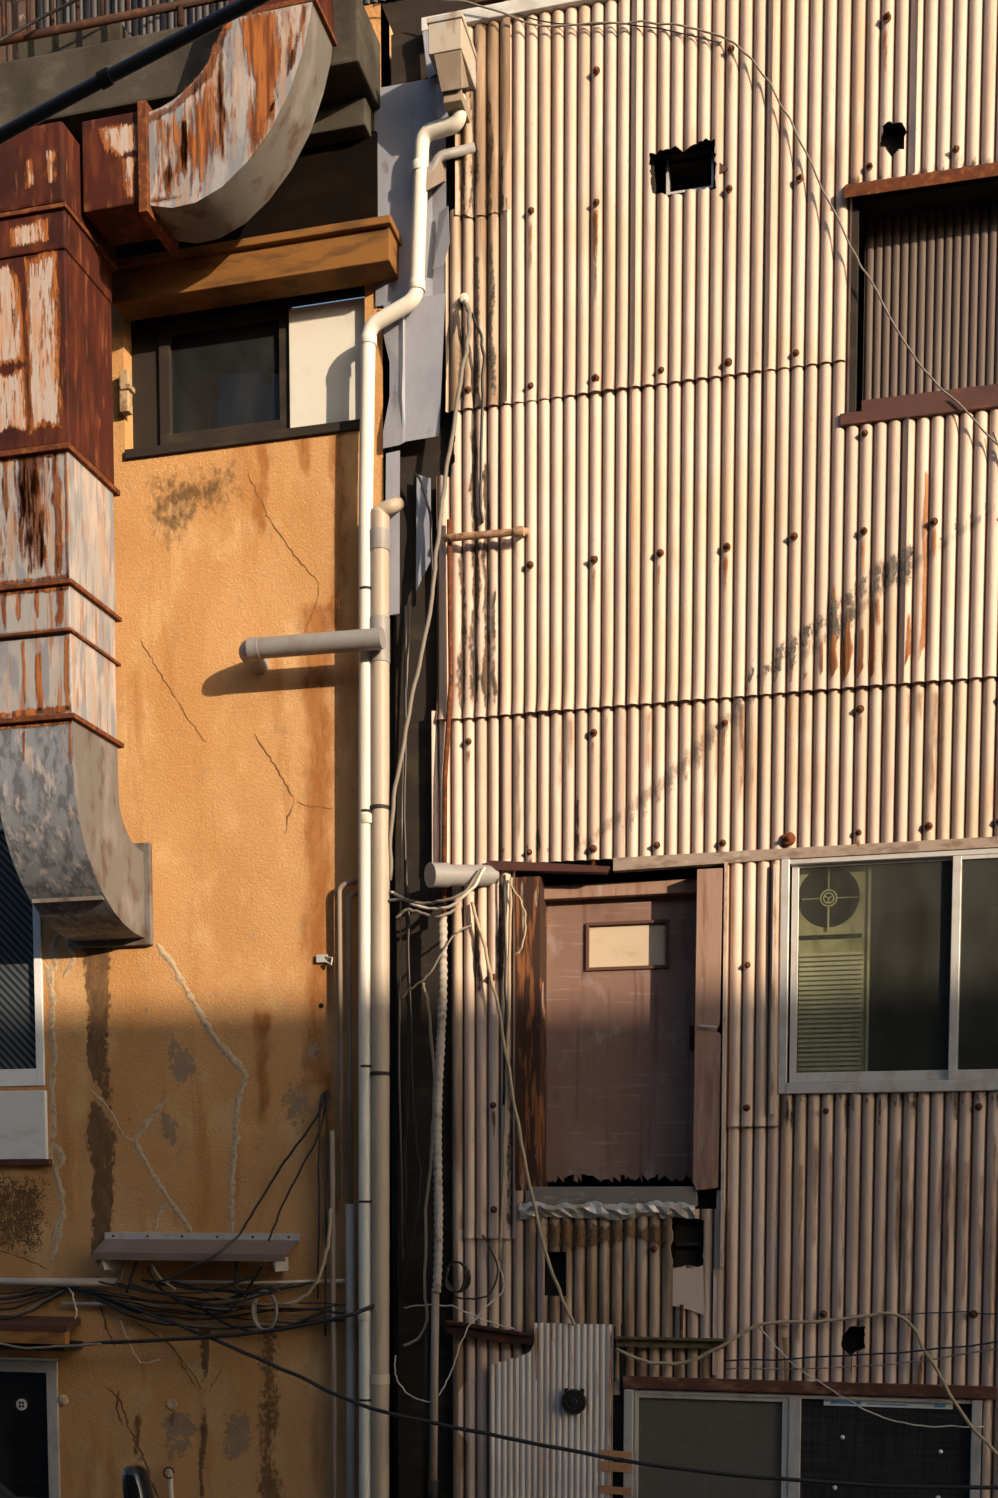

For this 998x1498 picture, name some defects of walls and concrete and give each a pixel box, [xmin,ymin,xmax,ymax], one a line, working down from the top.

corrosion [99,3,307,202]
corrosion [0,218,63,434]
corrosion [0,451,72,763]
crack [248,473,319,630]
corrosion [790,587,886,683]
corrosion [905,472,936,664]
crack [253,733,332,834]
crack [1,933,193,1269]
water stain [82,948,117,1265]
crack [156,943,249,1232]
water stain [0,1170,51,1259]
water stain [258,1333,282,1498]